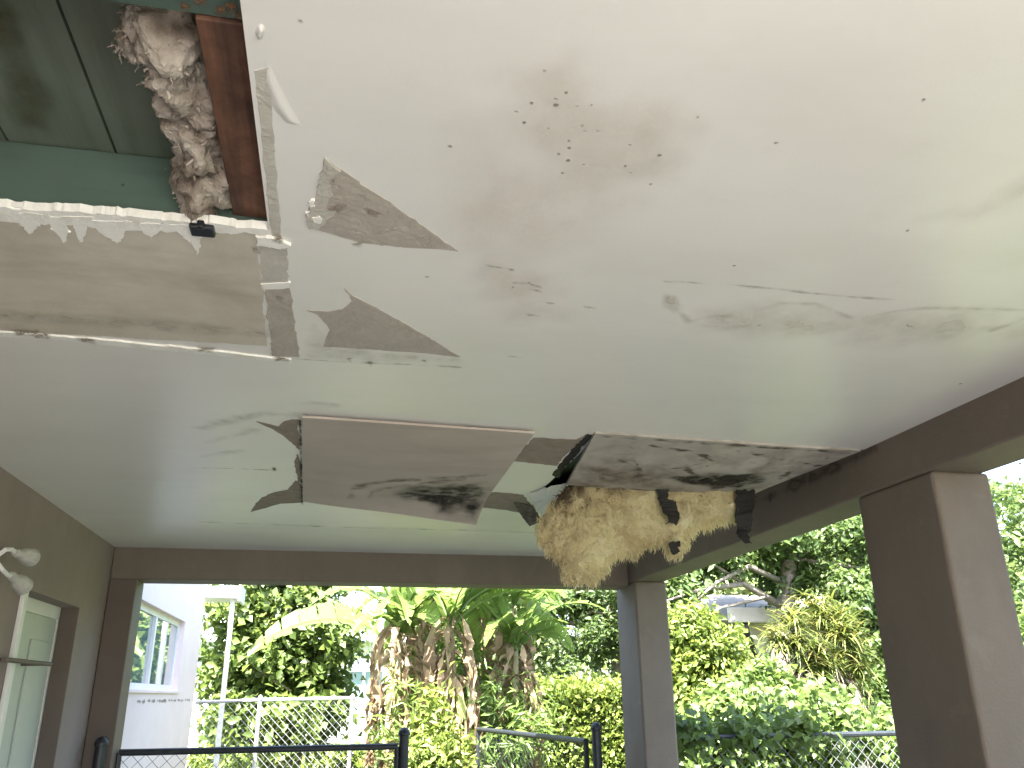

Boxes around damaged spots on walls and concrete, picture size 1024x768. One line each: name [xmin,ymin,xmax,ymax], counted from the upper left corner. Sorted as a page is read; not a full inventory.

flaking render [305,157,459,252]
peeling [0,212,267,346]
peeling [306,288,460,364]
leakage [400,485,480,511]
leakage [673,467,761,489]
leakage [781,450,840,491]